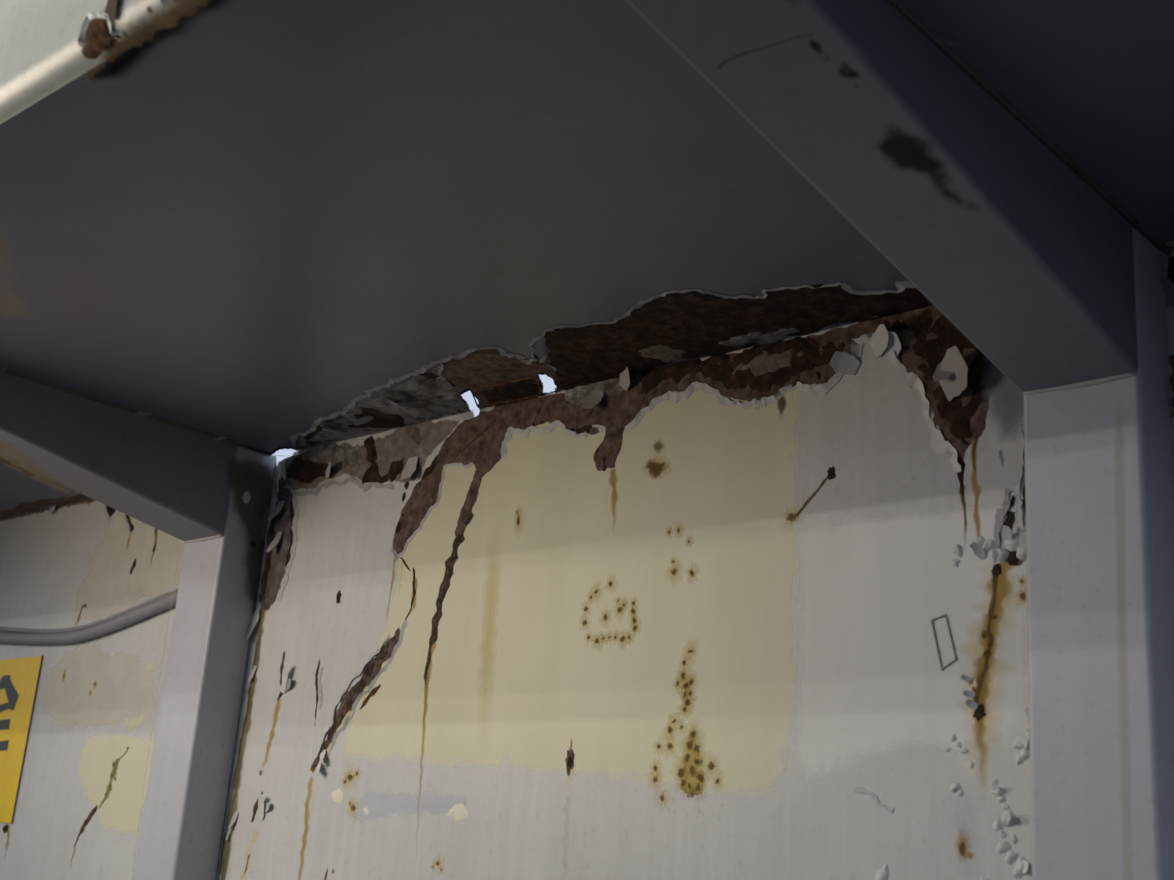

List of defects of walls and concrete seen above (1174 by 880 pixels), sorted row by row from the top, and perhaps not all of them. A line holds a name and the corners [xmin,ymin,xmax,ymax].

corrosion [77,0,210,80]
peeling [284,361,468,502]
peeling [984,361,1024,436]
crack [245,461,299,640]
corrosion [388,280,990,805]
peeling [951,525,1026,568]
crack [242,557,418,880]
corrosion [960,561,1027,770]
crack [71,747,129,862]